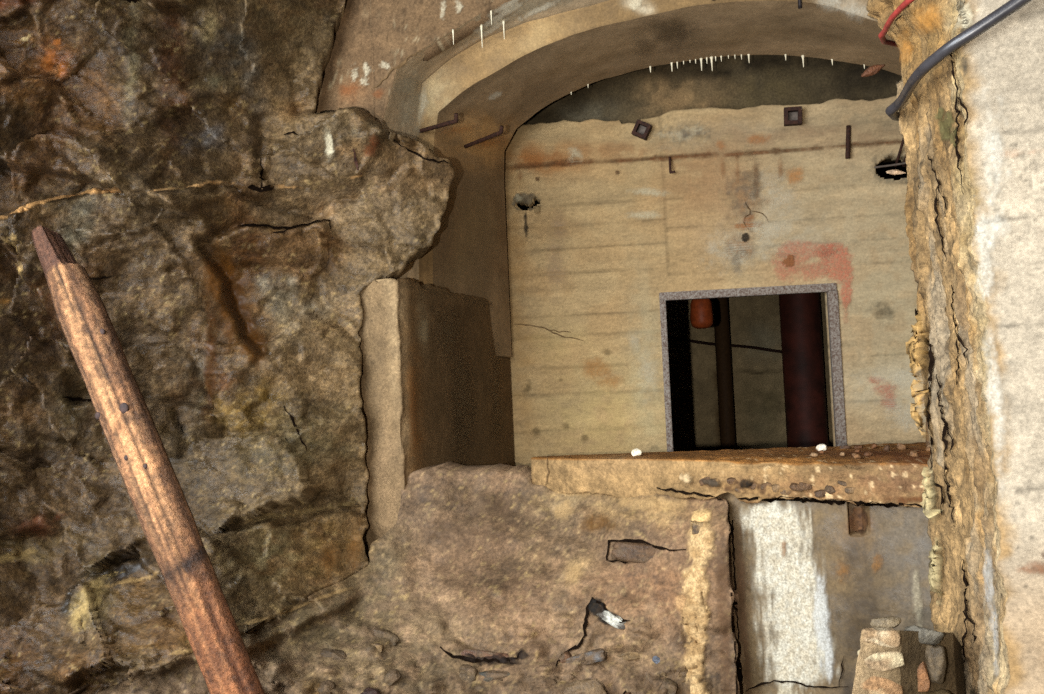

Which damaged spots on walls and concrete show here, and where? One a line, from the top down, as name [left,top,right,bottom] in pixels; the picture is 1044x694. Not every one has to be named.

crack [656,285,968,694]
crack [440,646,519,663]
crack [556,597,630,667]